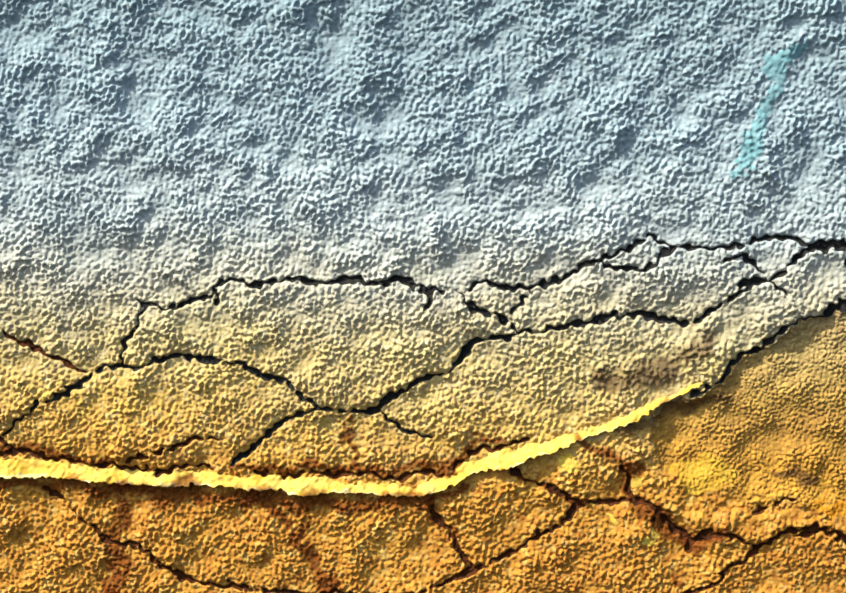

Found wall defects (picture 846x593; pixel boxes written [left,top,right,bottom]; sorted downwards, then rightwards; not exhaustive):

crack [0,233,846,483]
rust [229,415,506,477]
crack [43,486,301,593]
rust [0,475,469,593]
crack [412,465,846,593]